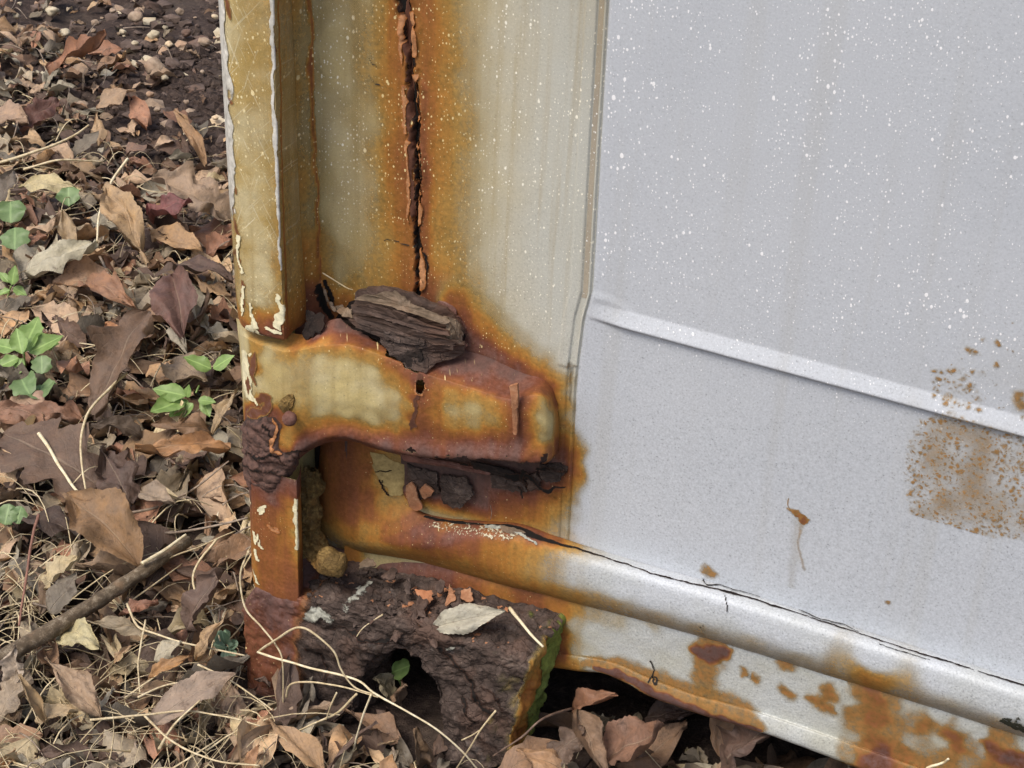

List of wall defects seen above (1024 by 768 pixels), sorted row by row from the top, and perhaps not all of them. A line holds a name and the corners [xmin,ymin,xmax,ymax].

crack [369,0,429,296]
peeling [236,235,286,336]
peeling [242,350,272,419]
corrosion [231,0,766,749]
peeling [370,452,405,496]
corrosion [787,498,810,525]
corrosion [907,364,1024,538]
crack [424,515,1024,686]
corrosion [776,655,1024,768]